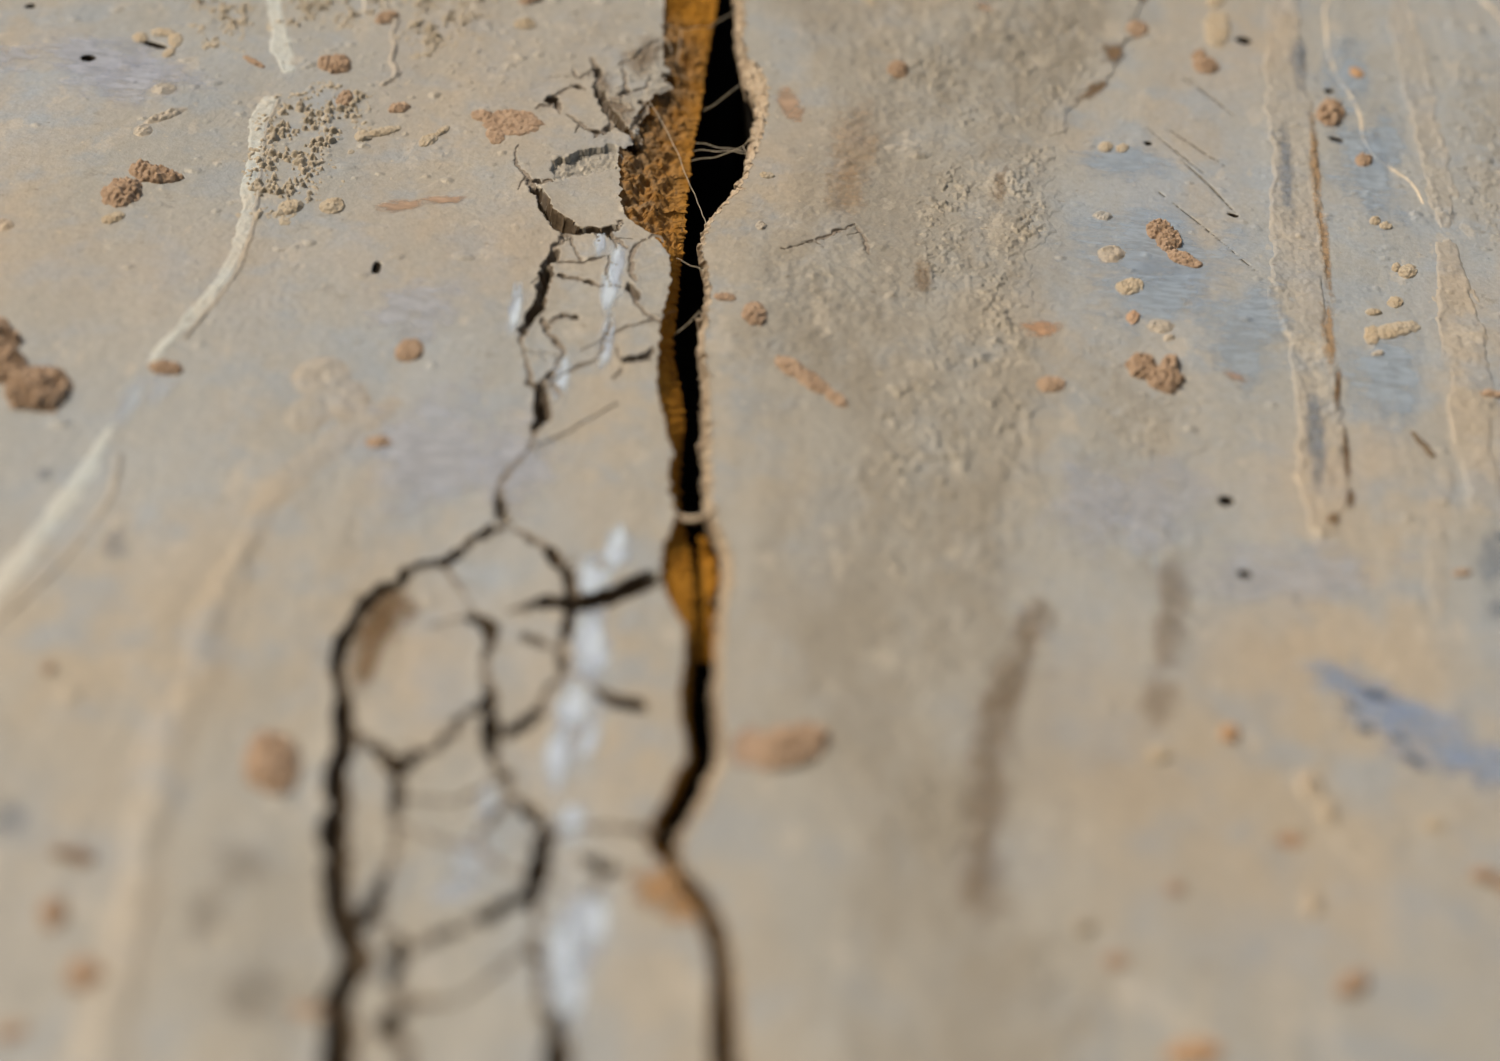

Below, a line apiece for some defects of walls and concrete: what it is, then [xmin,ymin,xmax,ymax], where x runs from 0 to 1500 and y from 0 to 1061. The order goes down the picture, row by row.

crack [316,0,772,1061]